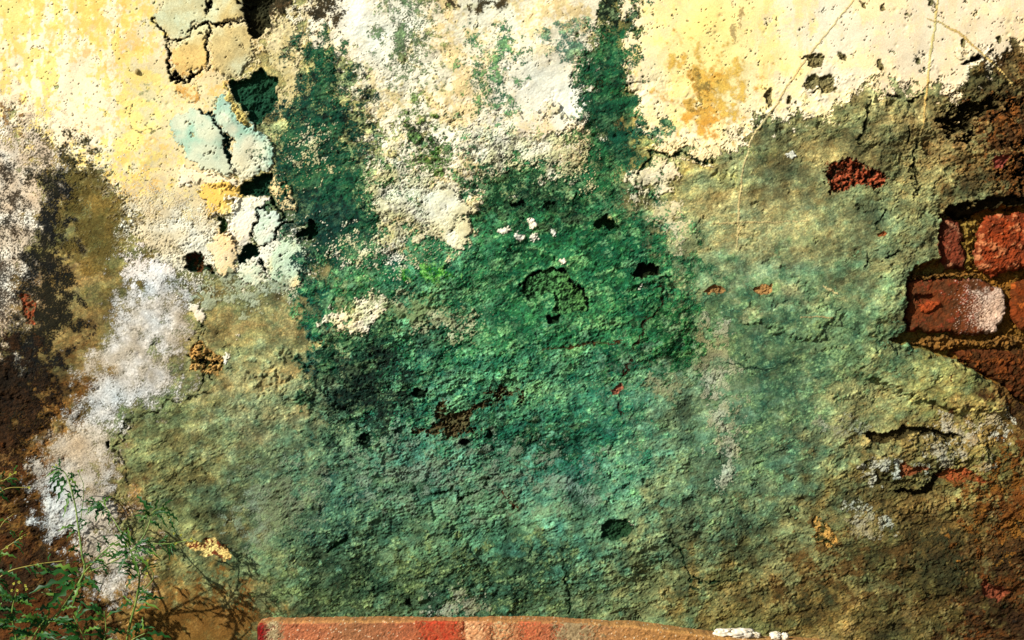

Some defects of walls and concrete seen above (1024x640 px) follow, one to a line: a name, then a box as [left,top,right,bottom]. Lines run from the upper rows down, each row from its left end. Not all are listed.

crack [151,0,257,84]
peeling [0,0,1024,376]
leakage [0,126,201,640]
leakage [644,311,750,494]
spalling [900,462,988,484]
spalling [889,204,1024,406]
leakage [420,579,492,617]